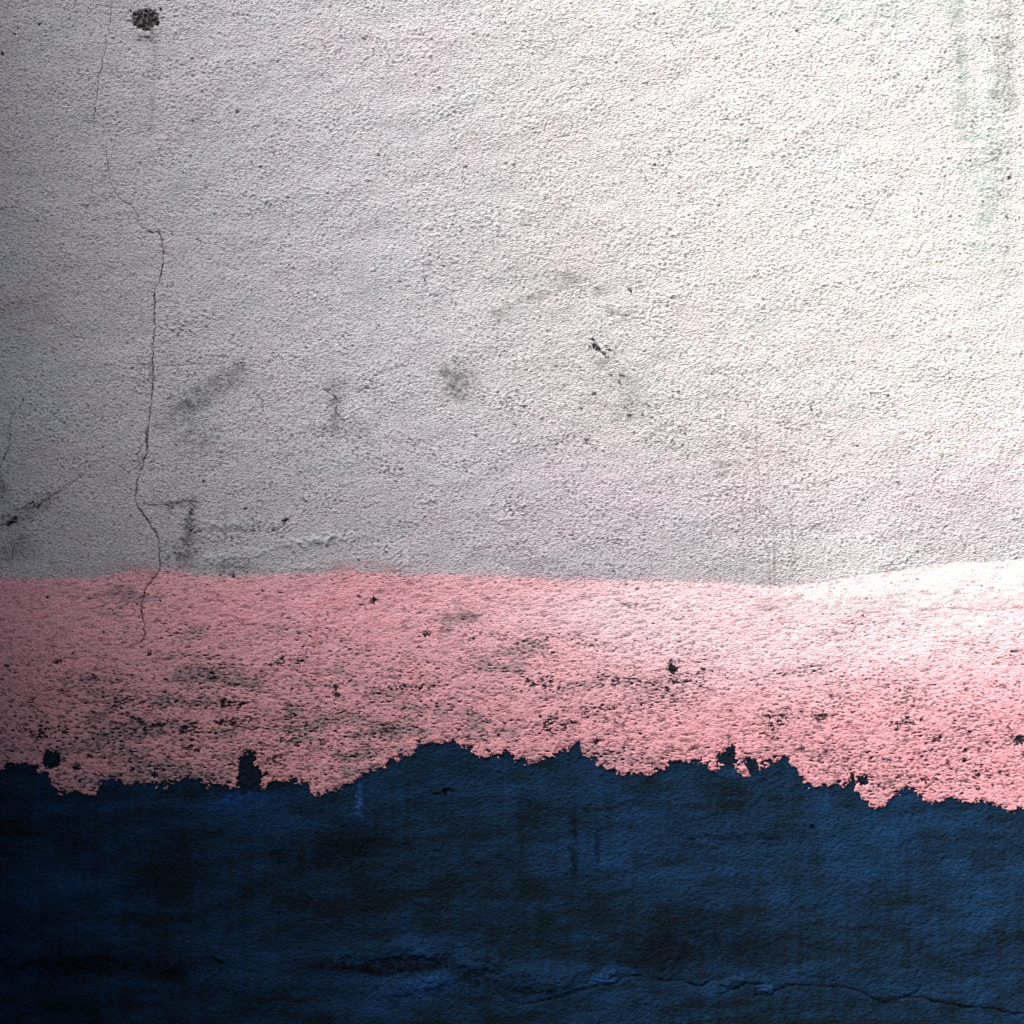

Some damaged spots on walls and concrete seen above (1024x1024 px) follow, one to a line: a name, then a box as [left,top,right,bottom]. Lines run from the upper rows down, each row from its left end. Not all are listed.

crack [136,225,178,637]